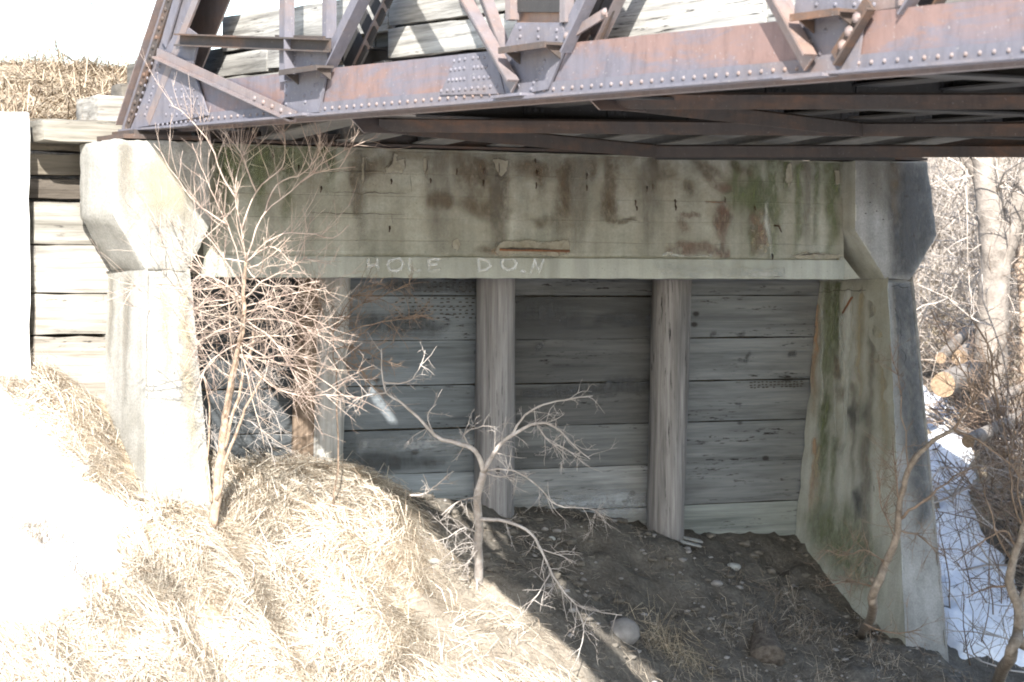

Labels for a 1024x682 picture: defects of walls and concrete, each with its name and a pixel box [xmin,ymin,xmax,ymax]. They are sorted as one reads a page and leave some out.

damp [427,158,572,226]
damp [734,160,819,236]
damp [814,283,887,520]